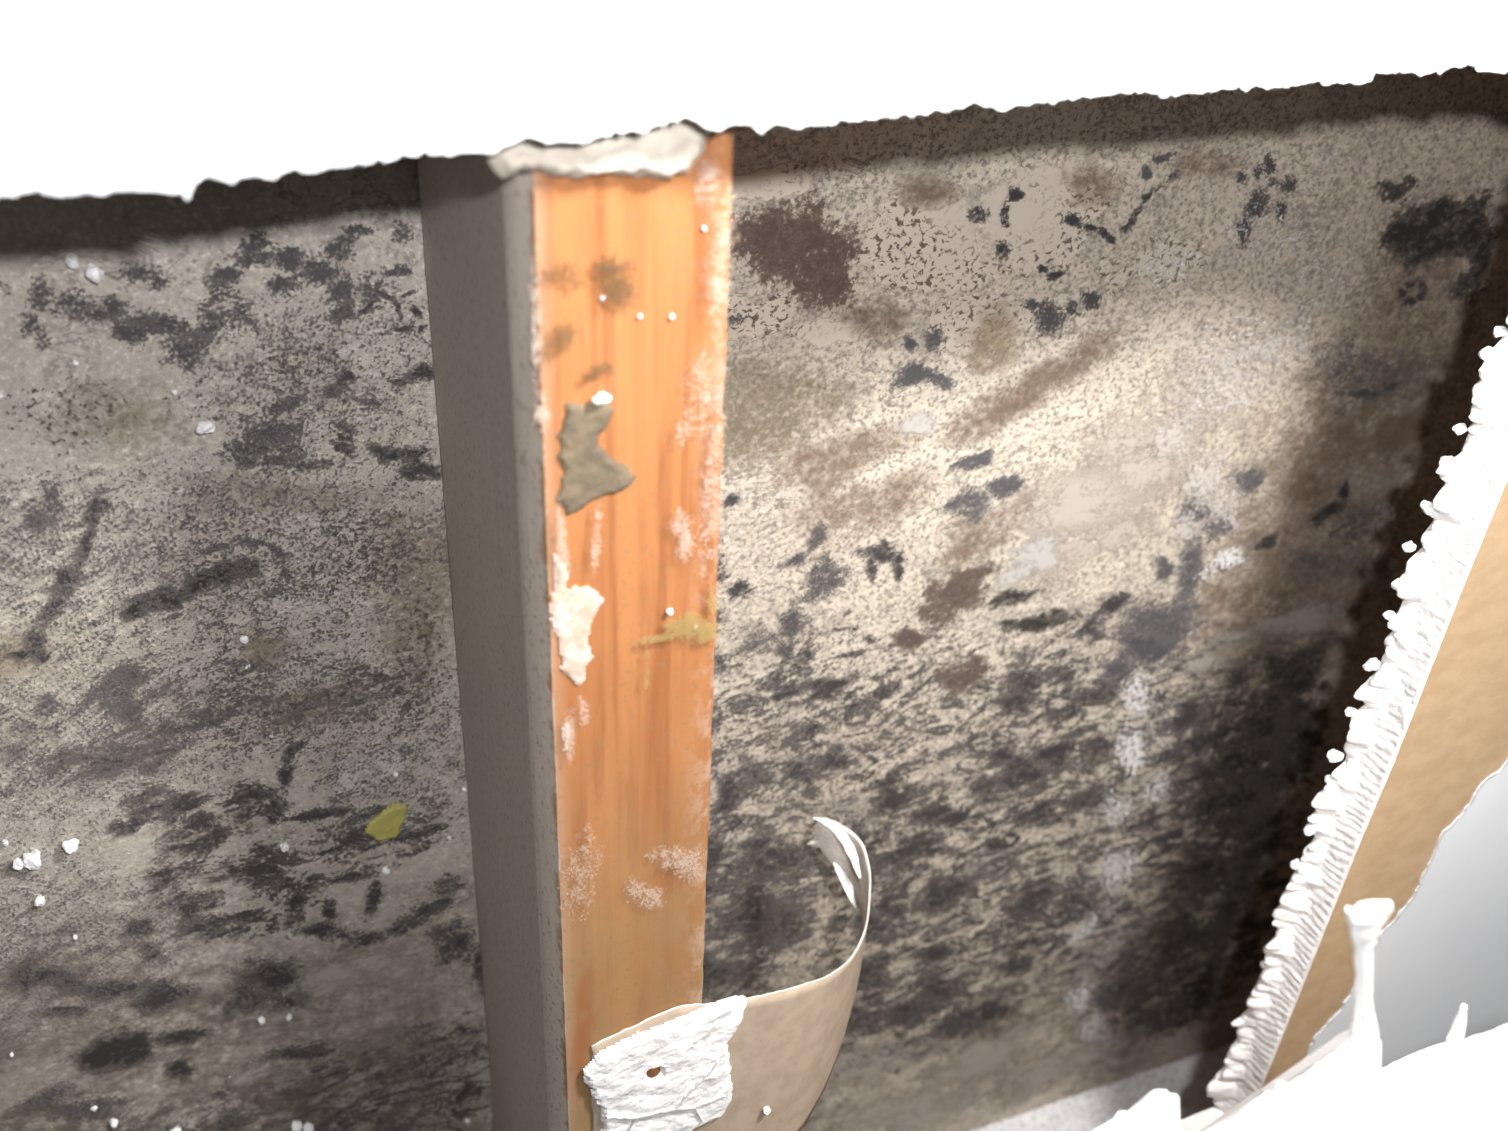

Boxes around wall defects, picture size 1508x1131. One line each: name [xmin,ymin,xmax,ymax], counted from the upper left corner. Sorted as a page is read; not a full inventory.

leakage [538,249,639,313]
leakage [539,319,582,366]
leakage [583,360,616,383]
peeling [1478,326,1507,361]
peeling [1452,423,1467,435]
flaking render [549,553,604,686]
leakage [640,151,1498,1083]
peeling [1171,599,1342,674]
leakage [0,219,495,1131]
flaking render [561,724,570,752]
peeling [1262,480,1508,1088]